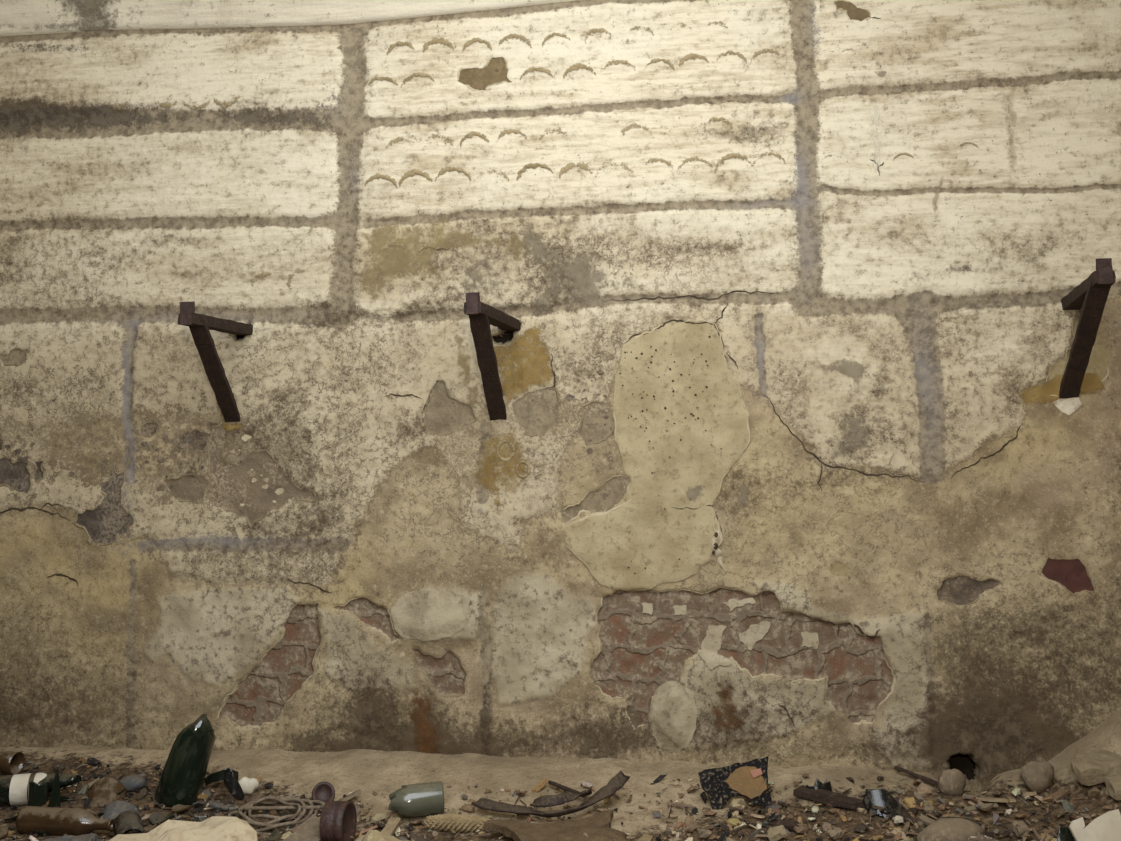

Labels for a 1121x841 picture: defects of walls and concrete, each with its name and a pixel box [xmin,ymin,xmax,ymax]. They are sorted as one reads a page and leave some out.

spalling [457,57,511,91]
leakage [0,102,188,134]
leakage [221,107,328,129]
crack [607,290,774,369]
spalling [0,428,45,493]
crack [762,394,922,491]
crack [952,423,1023,477]
spalling [512,320,896,730]
spalling [937,576,1003,605]
peeling [1042,557,1095,595]
flaking render [218,598,400,728]
flaking render [413,648,467,697]